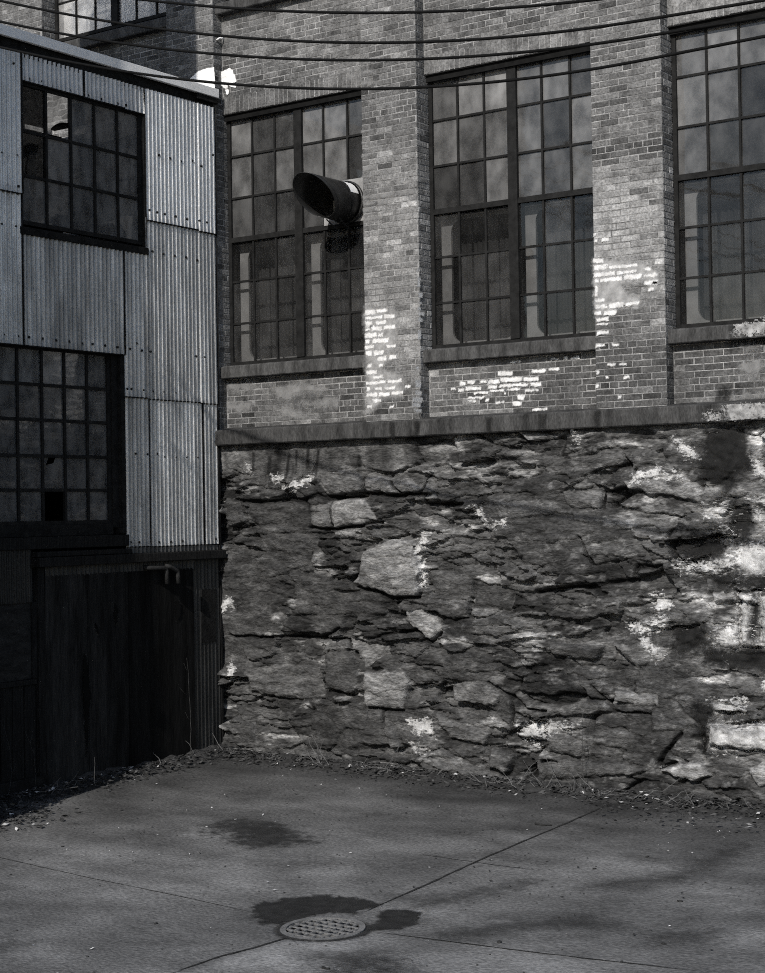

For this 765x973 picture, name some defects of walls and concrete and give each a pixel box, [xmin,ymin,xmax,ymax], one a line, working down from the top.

peeling [416,268,424,340]
peeling [593,258,660,348]
peeling [364,307,423,414]
peeling [451,356,580,406]